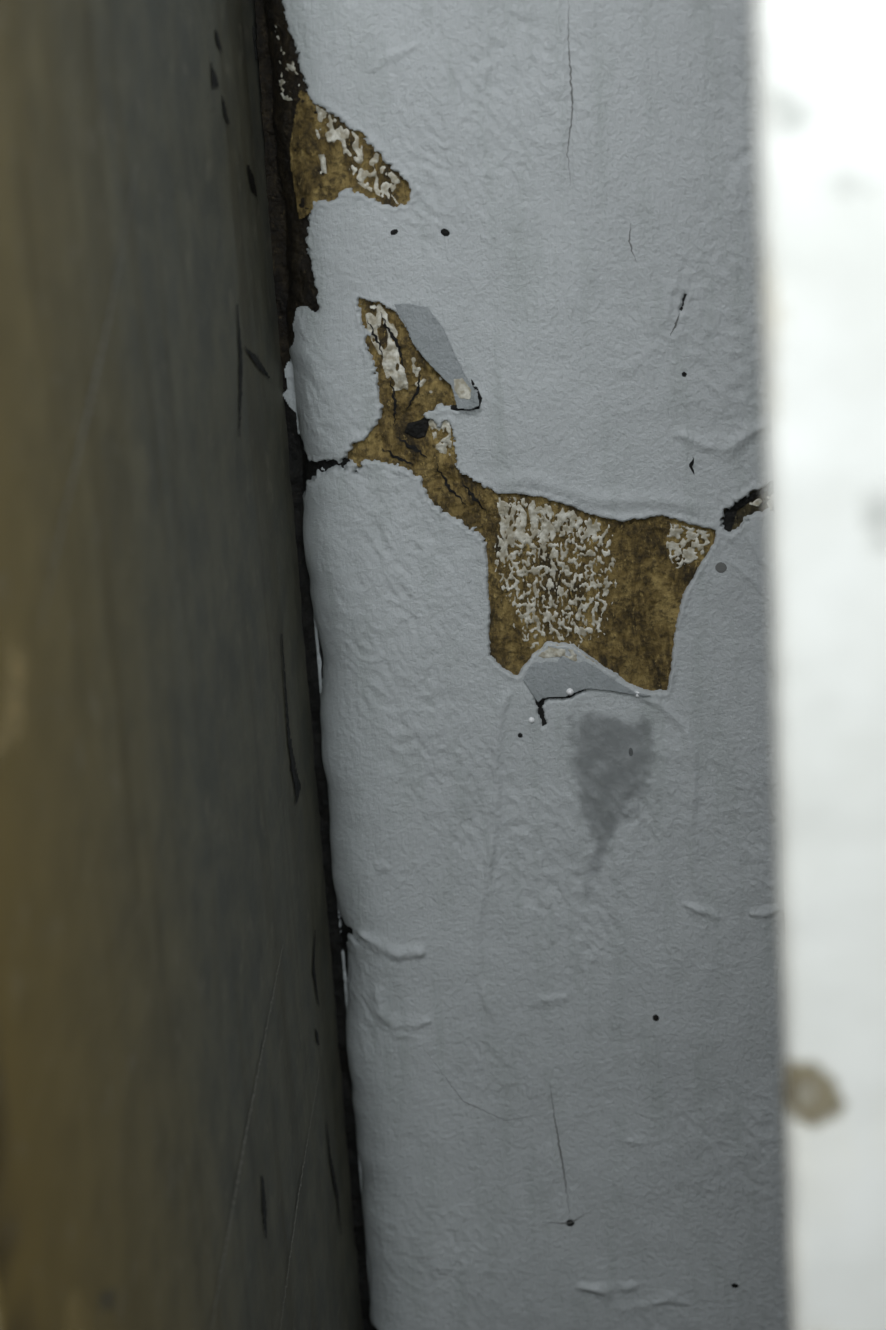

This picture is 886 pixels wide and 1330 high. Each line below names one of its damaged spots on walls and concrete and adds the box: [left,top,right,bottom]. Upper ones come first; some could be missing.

spalling [255,0,411,389]
peeling [347,298,727,726]
crack [237,304,377,1330]